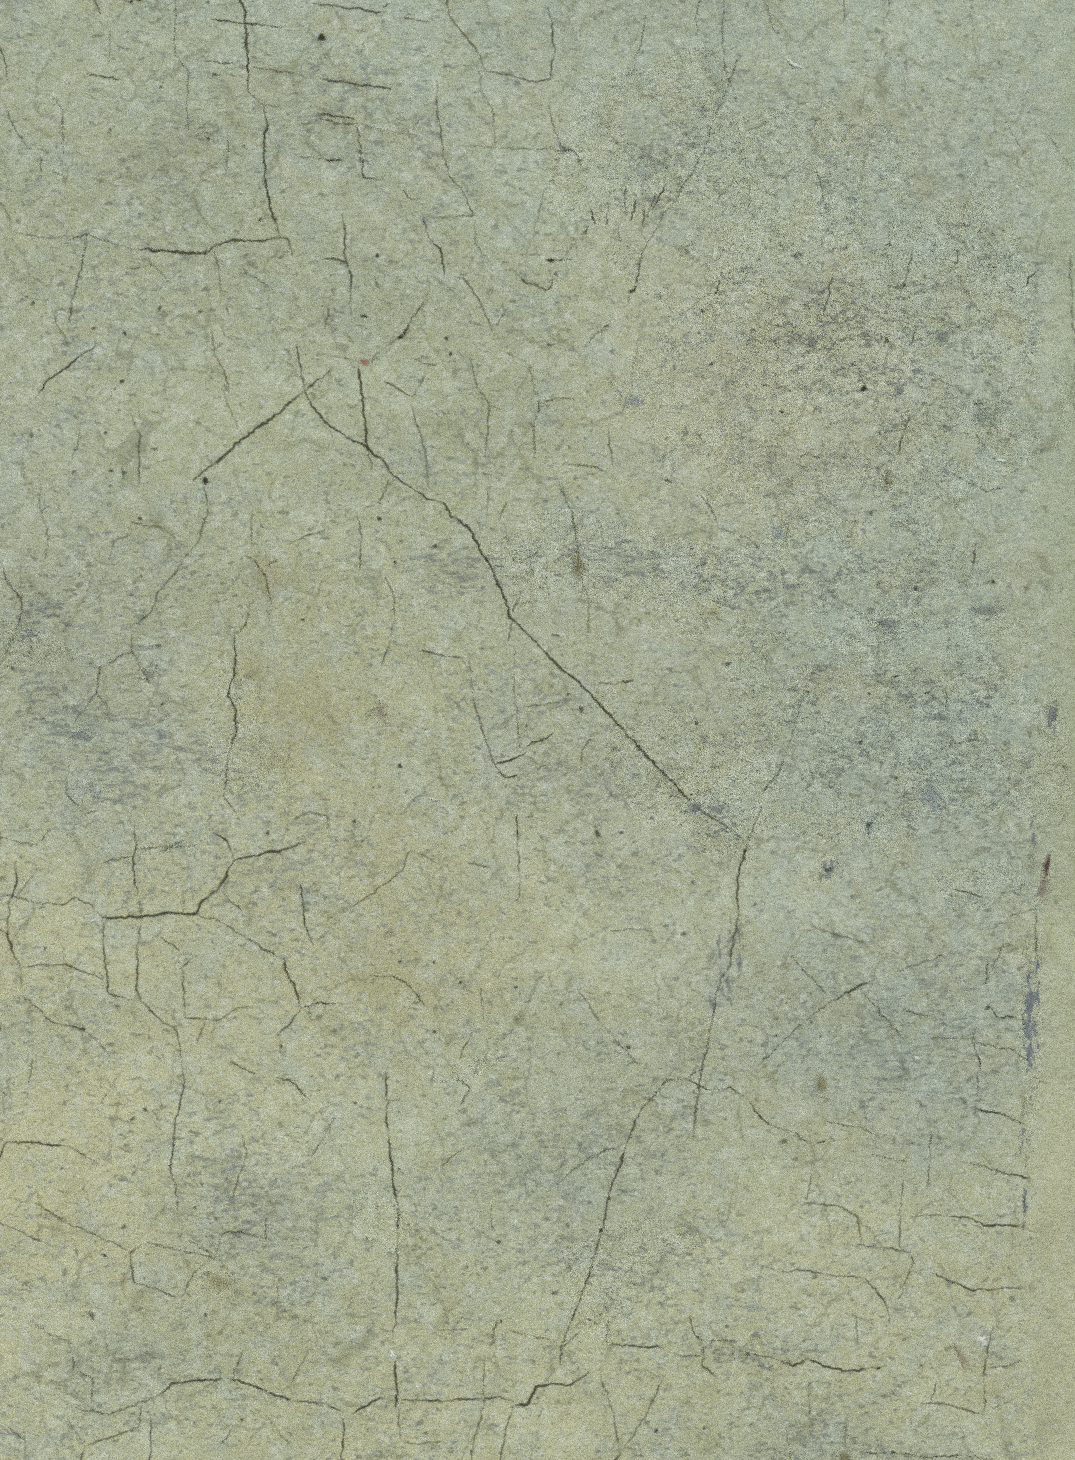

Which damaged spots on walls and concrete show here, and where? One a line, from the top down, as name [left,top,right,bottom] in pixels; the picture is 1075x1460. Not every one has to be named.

crack [313,0,578,156]
crack [28,0,490,390]
crack [4,573,23,628]
crack [47,223,1037,1460]
crack [0,1141,85,1157]
crack [0,1204,267,1296]